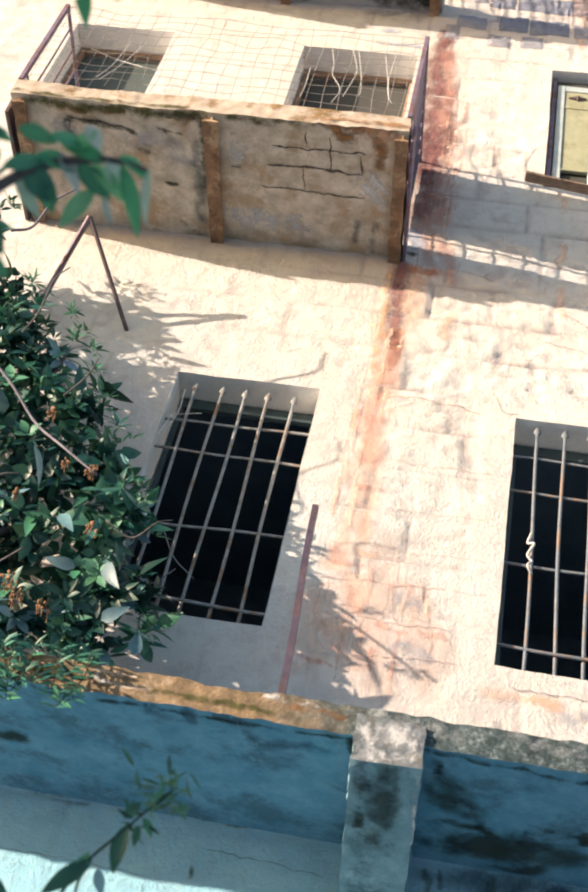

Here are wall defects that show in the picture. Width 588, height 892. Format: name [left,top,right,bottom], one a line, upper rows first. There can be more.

leakage [376,0,430,10]
flaking render [444,0,588,49]
crack [261,133,366,199]
rust [322,124,396,170]
rust [412,31,455,219]
rust [372,260,436,366]
leakage [354,778,396,840]
leakage [428,750,588,892]